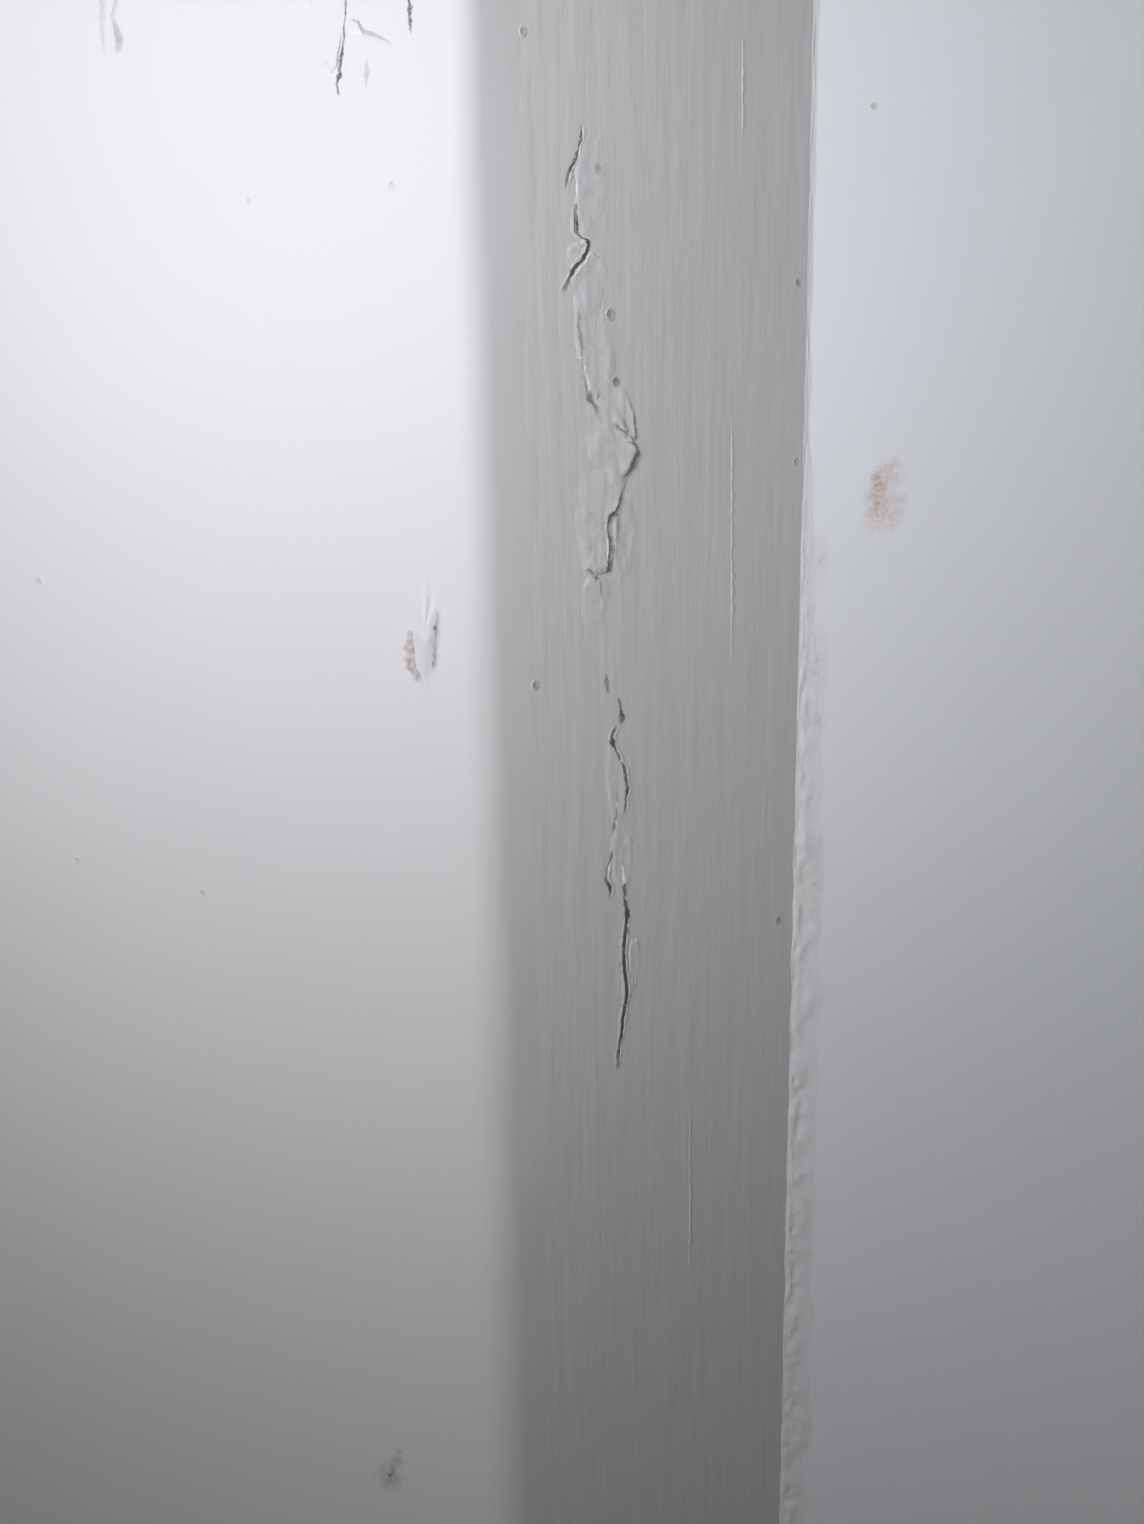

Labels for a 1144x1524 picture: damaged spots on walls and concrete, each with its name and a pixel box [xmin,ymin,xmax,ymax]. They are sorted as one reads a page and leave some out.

crack [336,0,415,96]
crack [559,125,609,296]
crack [604,706,641,1071]